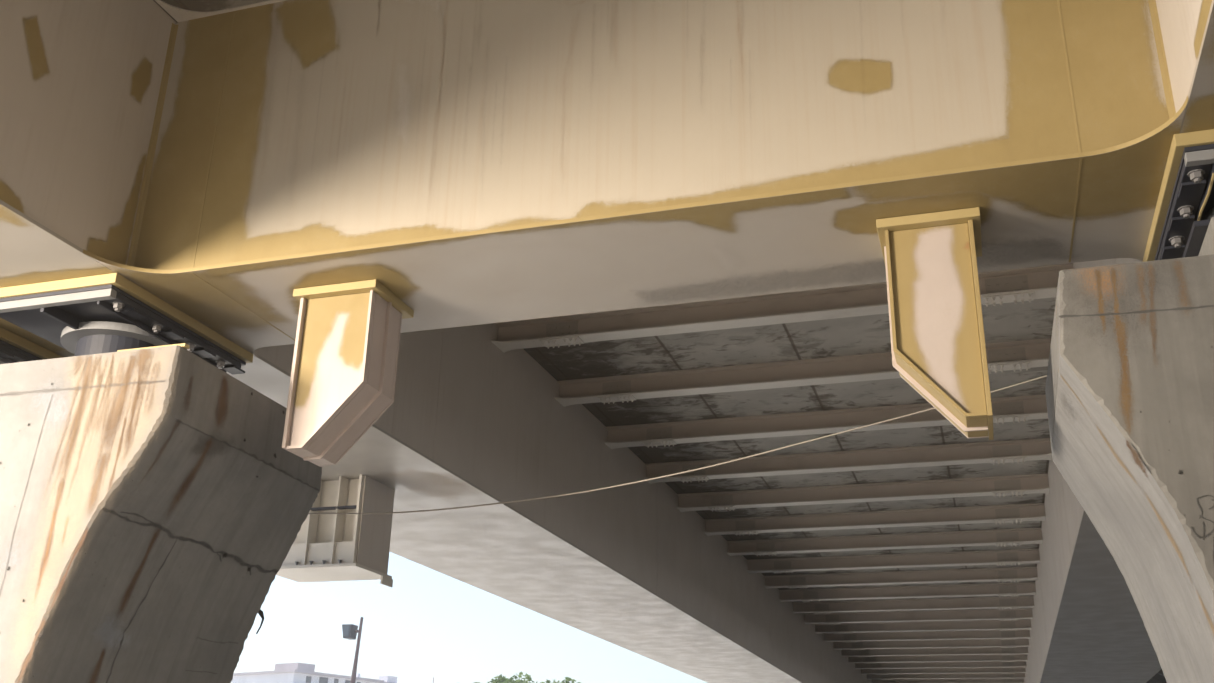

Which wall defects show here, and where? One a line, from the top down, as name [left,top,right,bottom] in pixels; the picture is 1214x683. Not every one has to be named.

rust [1058,263,1160,484]
rust [16,349,161,683]
rust [116,376,230,616]
crack [103,508,277,683]